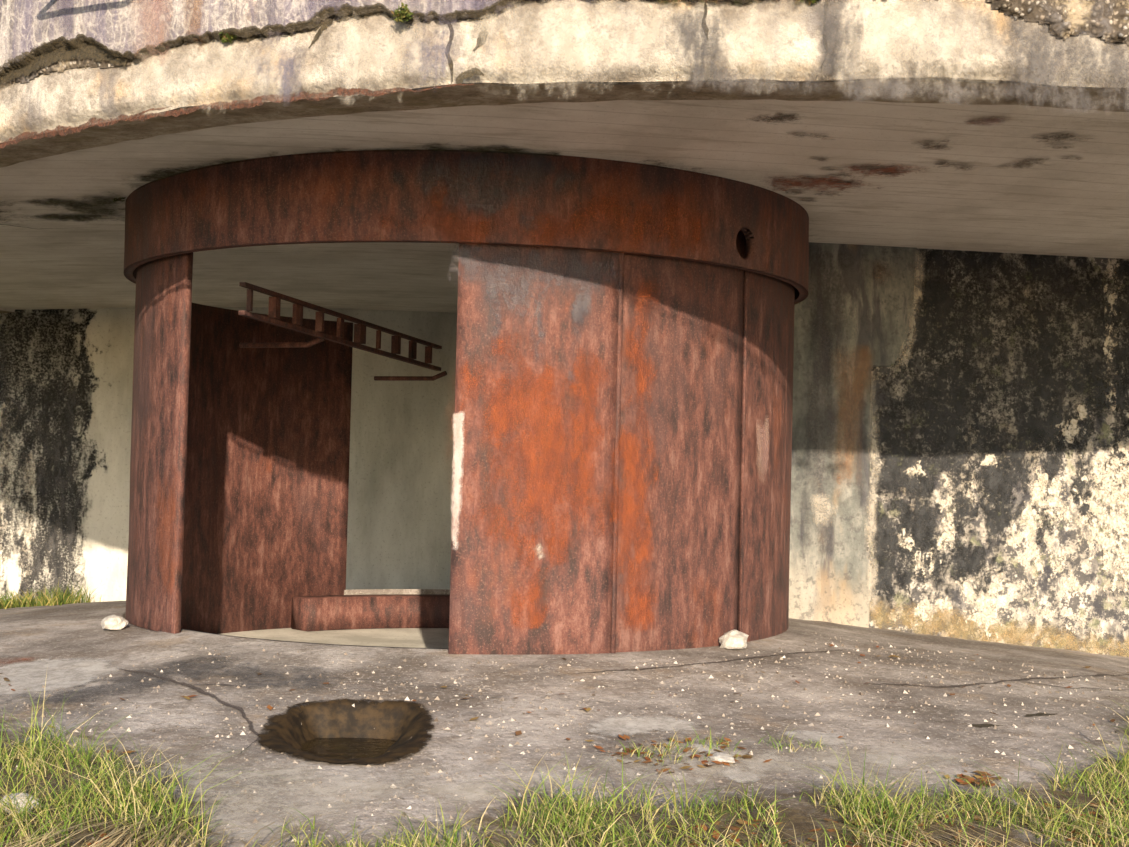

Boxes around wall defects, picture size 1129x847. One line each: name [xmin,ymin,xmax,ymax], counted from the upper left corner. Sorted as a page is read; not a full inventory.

spalling [986,0,1129,46]
rust [841,164,926,177]
water stain [858,248,1129,609]
water stain [0,309,111,604]
crack [563,650,838,675]
crack [118,668,260,753]
crack [868,674,1129,728]